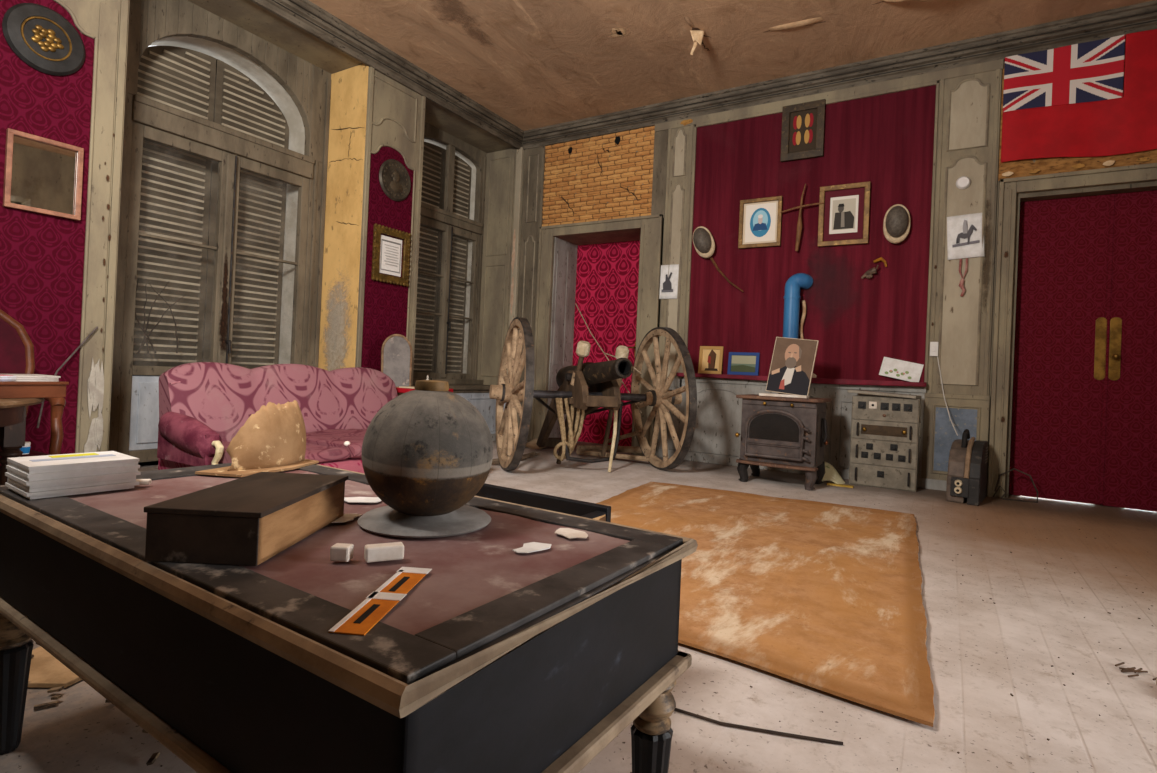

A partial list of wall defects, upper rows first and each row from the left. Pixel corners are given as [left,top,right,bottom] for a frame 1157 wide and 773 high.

peeling [684,17,711,55]